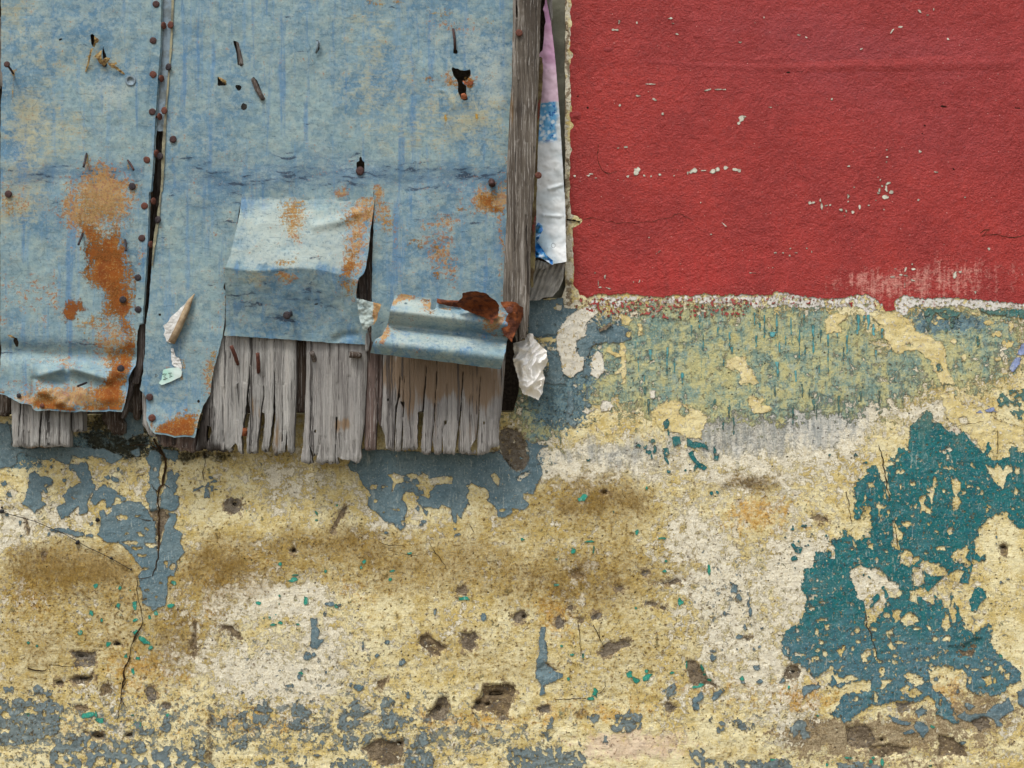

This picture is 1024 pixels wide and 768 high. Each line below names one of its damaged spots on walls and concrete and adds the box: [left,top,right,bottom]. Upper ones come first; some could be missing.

rust [458,191,505,216]
rust [338,210,395,296]
rust [33,190,136,411]
rust [423,298,460,314]
peeling [528,272,856,414]
peeling [870,302,1024,456]
rust [150,409,200,436]
peeling [635,390,719,473]
peeling [0,411,185,747]
crack [117,438,168,722]
spalling [254,682,449,768]
spalling [472,684,516,721]